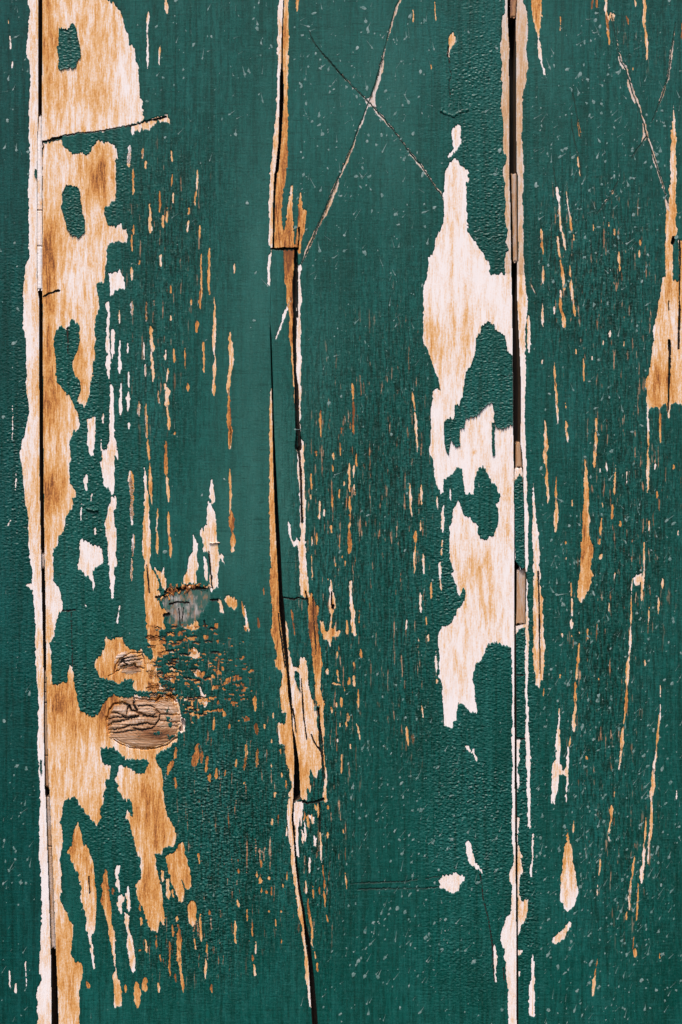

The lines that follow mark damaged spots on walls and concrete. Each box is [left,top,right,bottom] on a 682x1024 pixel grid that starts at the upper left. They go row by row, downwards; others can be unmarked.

crack [42,115,167,190]
peeling [267,0,307,398]
peeling [645,105,682,432]
peeling [34,0,254,1024]
peeling [423,0,546,1024]
peeling [577,459,594,603]
crack [278,590,326,832]
peeling [552,830,578,944]